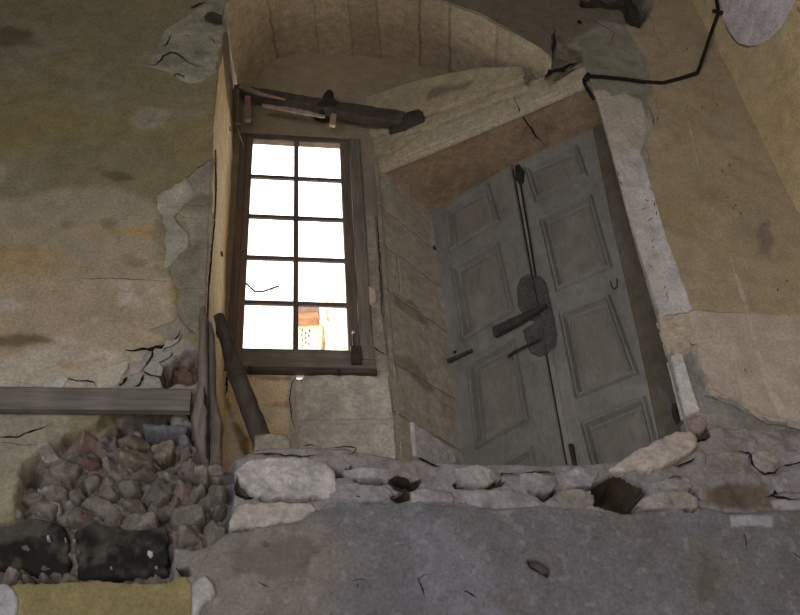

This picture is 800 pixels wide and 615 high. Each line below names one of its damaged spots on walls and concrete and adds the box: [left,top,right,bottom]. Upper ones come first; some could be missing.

peeling [148,0,226,83]
peeling [720,0,795,48]
crack [514,98,547,147]
spalling [0,158,215,390]
peeling [667,344,800,430]
crack [2,423,50,445]